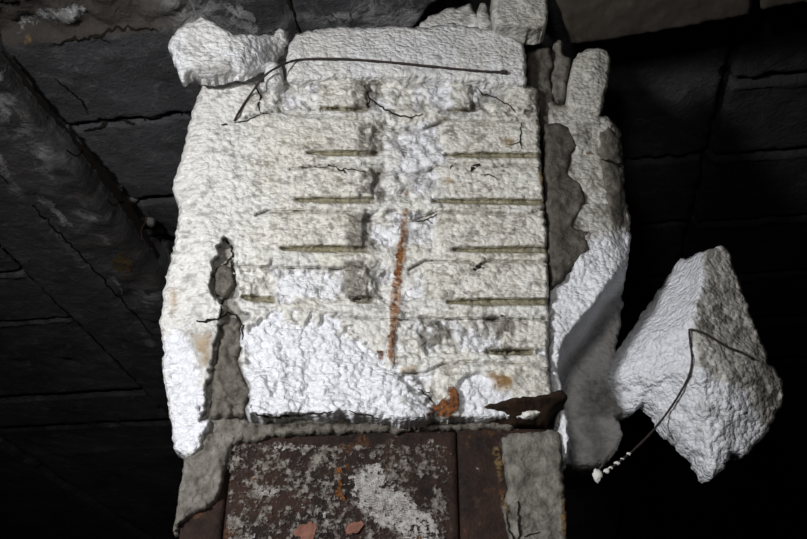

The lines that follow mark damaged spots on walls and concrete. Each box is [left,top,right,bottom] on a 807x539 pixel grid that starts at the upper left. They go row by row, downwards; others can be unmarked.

spalling [19,6,86,27]
crack [1,50,192,259]
corrosion [377,208,408,368]
corrosion [427,386,460,417]
corrosion [345,521,364,535]